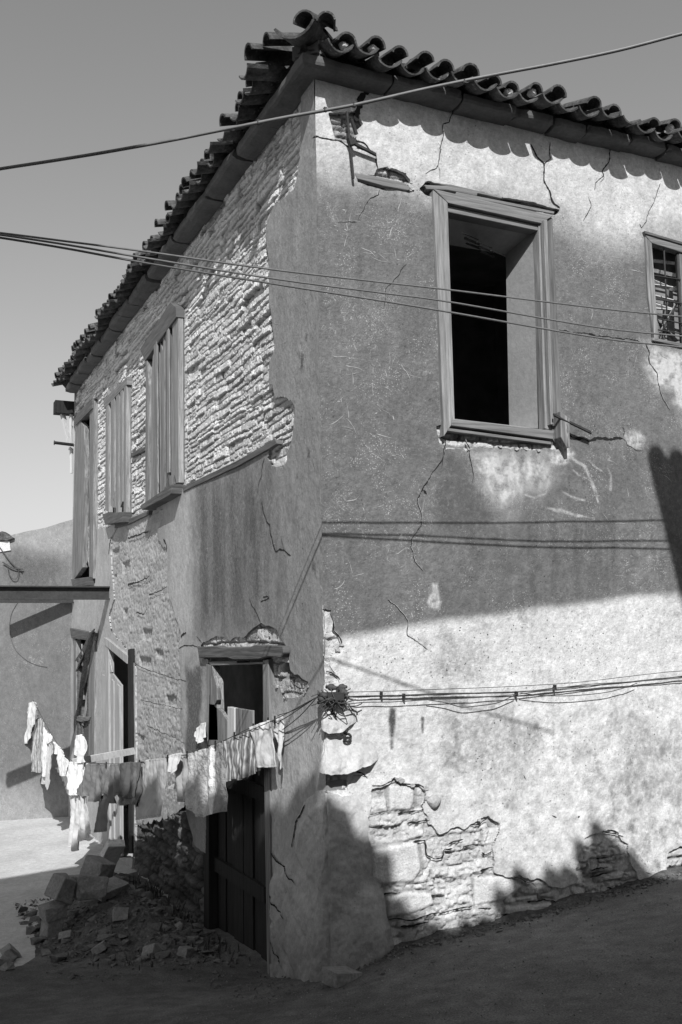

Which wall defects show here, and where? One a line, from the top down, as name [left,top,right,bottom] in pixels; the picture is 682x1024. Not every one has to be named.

flaking render [329,113,361,143]
flaking render [359,166,430,196]
crack [425,114,453,174]
flaking render [499,199,557,215]
crack [531,145,560,208]
crack [584,150,611,219]
crack [559,329,670,410]
crack [570,428,643,451]
crack [410,440,474,571]
water stain [441,448,586,533]
peeling [17,102,309,999]
flaking render [368,777,682,975]